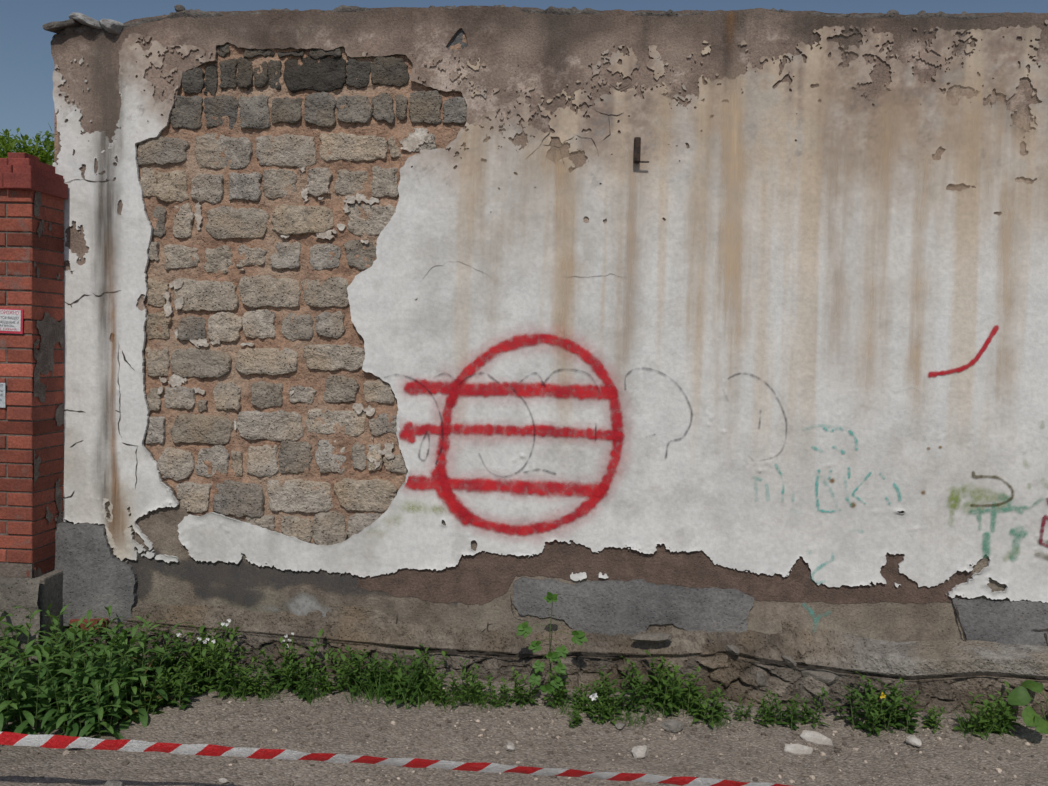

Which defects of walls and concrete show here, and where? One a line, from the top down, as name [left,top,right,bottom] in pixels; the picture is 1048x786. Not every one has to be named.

water stain [720,93,741,313]
crack [64,290,121,307]
spalling [50,5,1048,546]
crack [116,343,137,485]
peeling [357,539,973,605]